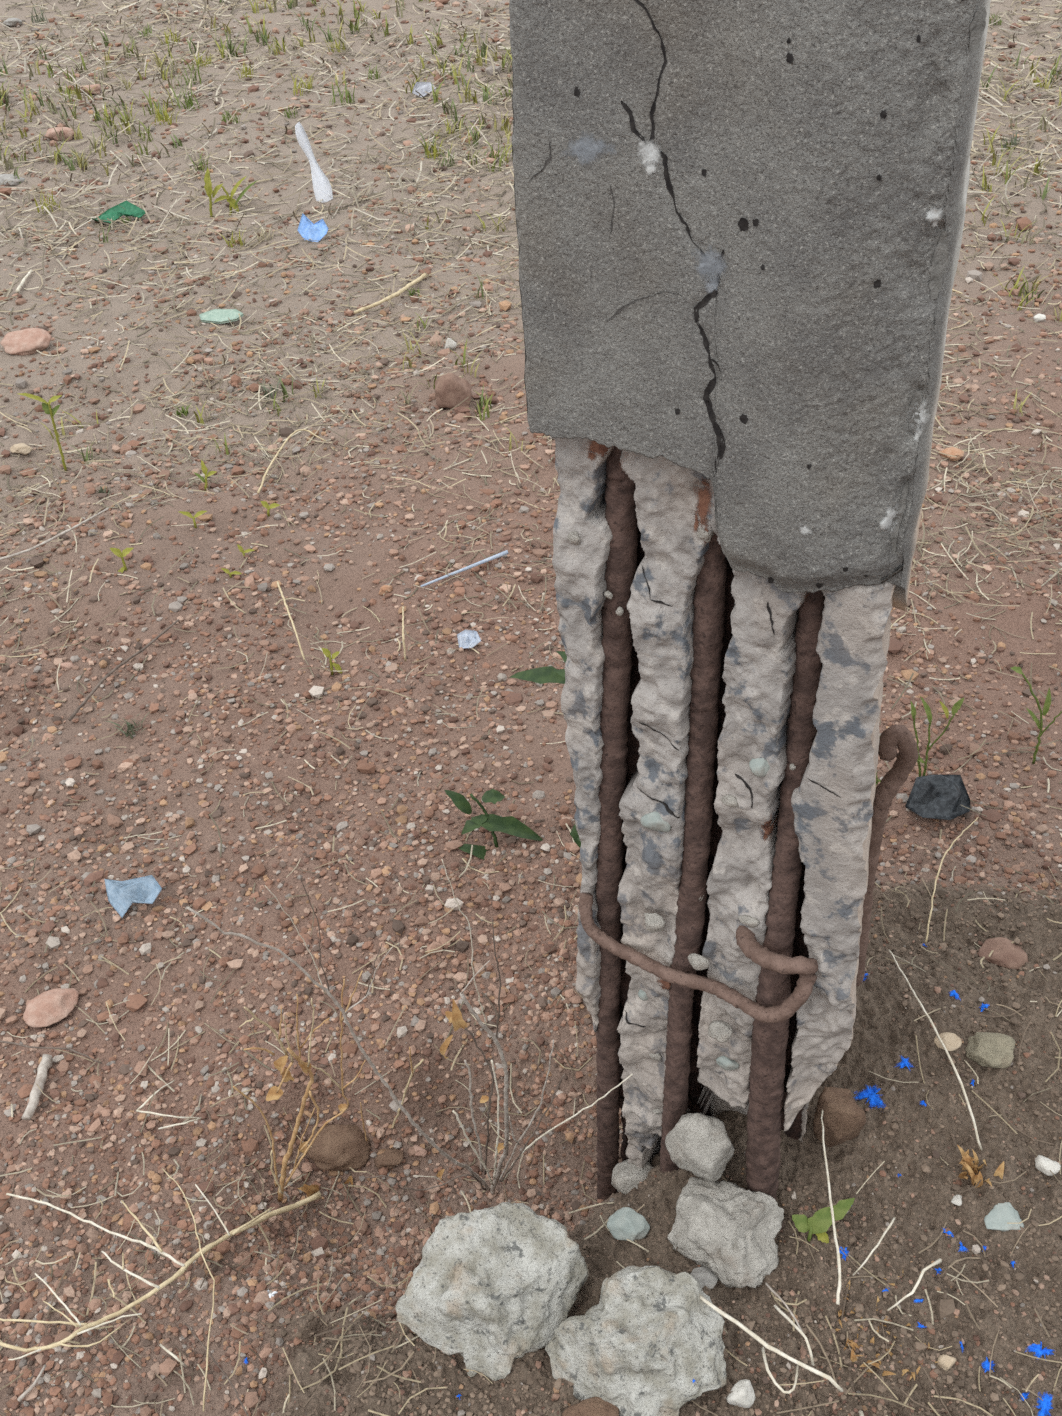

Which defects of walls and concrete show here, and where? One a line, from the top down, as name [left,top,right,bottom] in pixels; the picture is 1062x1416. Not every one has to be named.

crack [606,0,725,476]
rust [588,441,621,466]
rust [694,480,713,543]
spalling [552,437,894,1168]
rust [762,808,779,841]